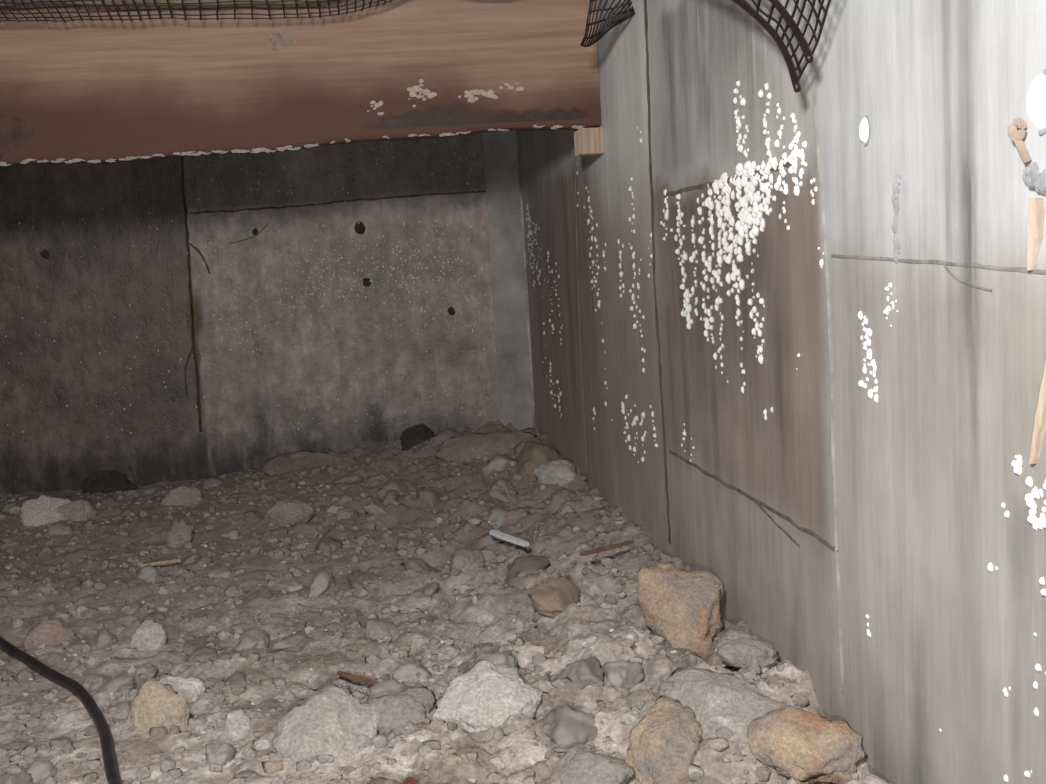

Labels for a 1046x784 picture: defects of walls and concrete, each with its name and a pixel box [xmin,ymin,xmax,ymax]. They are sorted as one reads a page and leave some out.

damp [379,109,584,129]
damp [526,203,563,344]
damp [577,80,817,394]
damp [883,282,898,327]
damp [858,311,878,403]
damp [611,394,658,463]
damp [1011,454,1046,530]